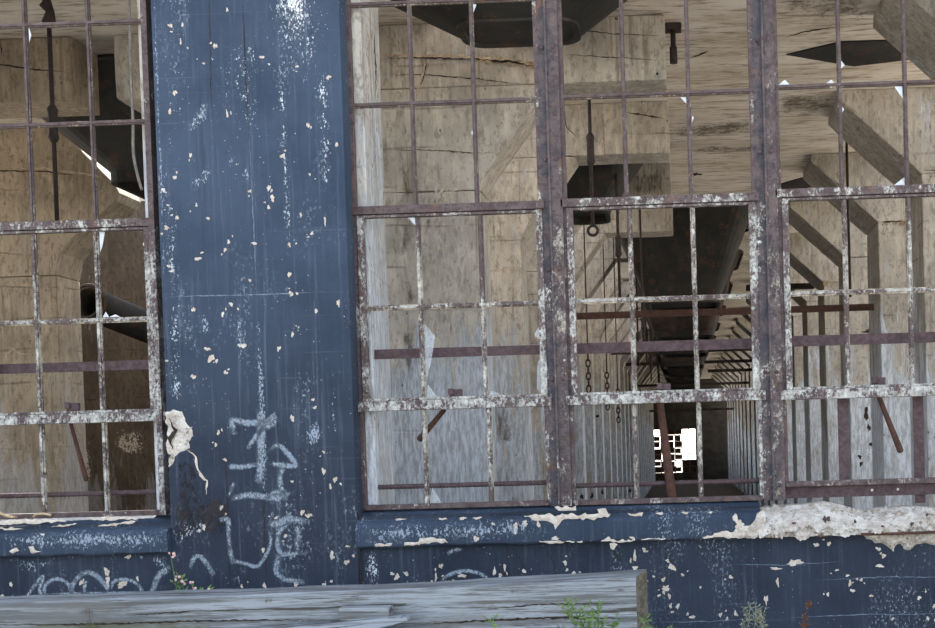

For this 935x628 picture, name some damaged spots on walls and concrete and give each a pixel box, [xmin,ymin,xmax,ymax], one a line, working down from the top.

peeling [0,518,76,536]
peeling [89,516,144,526]
peeling [404,537,448,546]
peeling [513,489,610,544]
peeling [602,537,666,570]
spalling [704,501,935,567]
peeling [770,559,804,587]